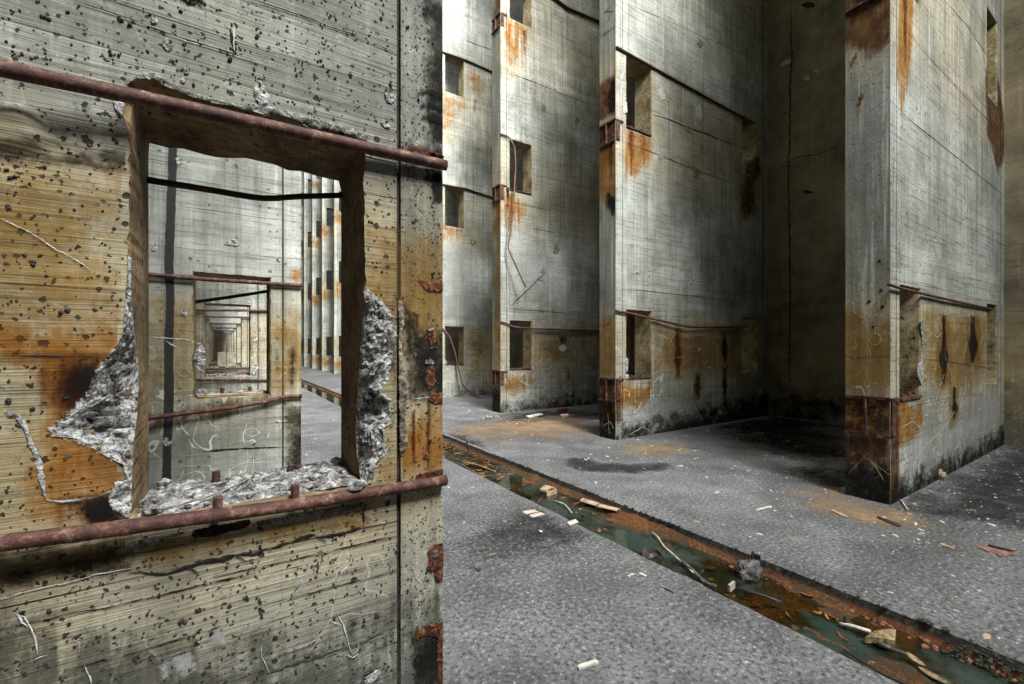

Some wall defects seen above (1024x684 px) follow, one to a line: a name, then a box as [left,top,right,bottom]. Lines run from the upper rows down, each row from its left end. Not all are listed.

rust [845,0,890,66]
rust [986,73,1004,166]
crack [775,3,841,395]
damp [939,317,948,381]
damp [969,316,978,361]
spalling [46,256,139,518]
spalling [356,288,409,485]
damp [474,418,584,435]
rust [427,543,443,581]
rust [415,621,443,684]